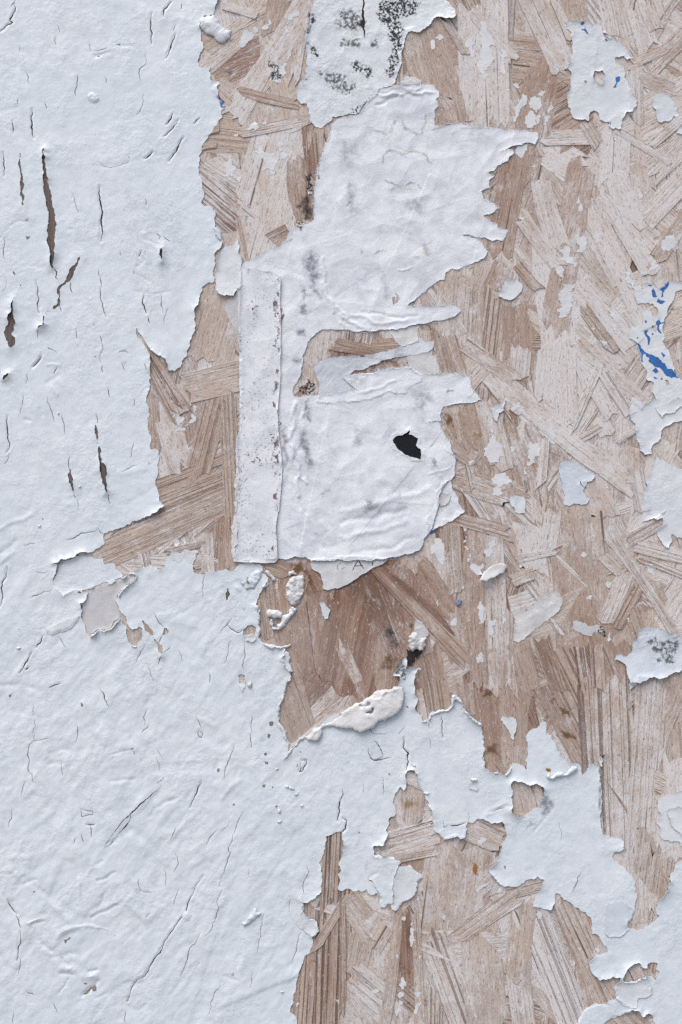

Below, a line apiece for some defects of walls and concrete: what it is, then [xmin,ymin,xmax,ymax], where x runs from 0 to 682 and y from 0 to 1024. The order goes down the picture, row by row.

crack [2,75,198,504]
peeling [53,0,366,653]
peeling [243,0,682,1024]